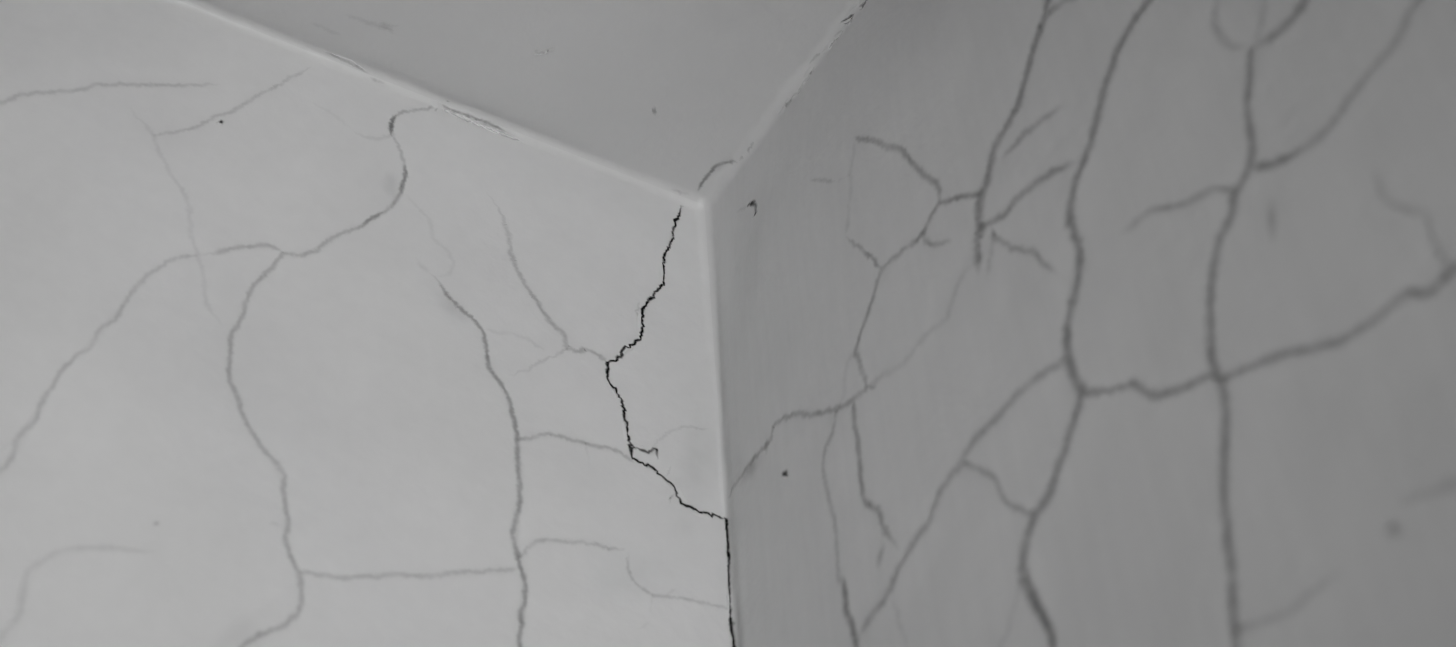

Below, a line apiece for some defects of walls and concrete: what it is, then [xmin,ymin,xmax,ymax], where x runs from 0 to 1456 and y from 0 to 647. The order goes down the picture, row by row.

crack [605,208,736,647]